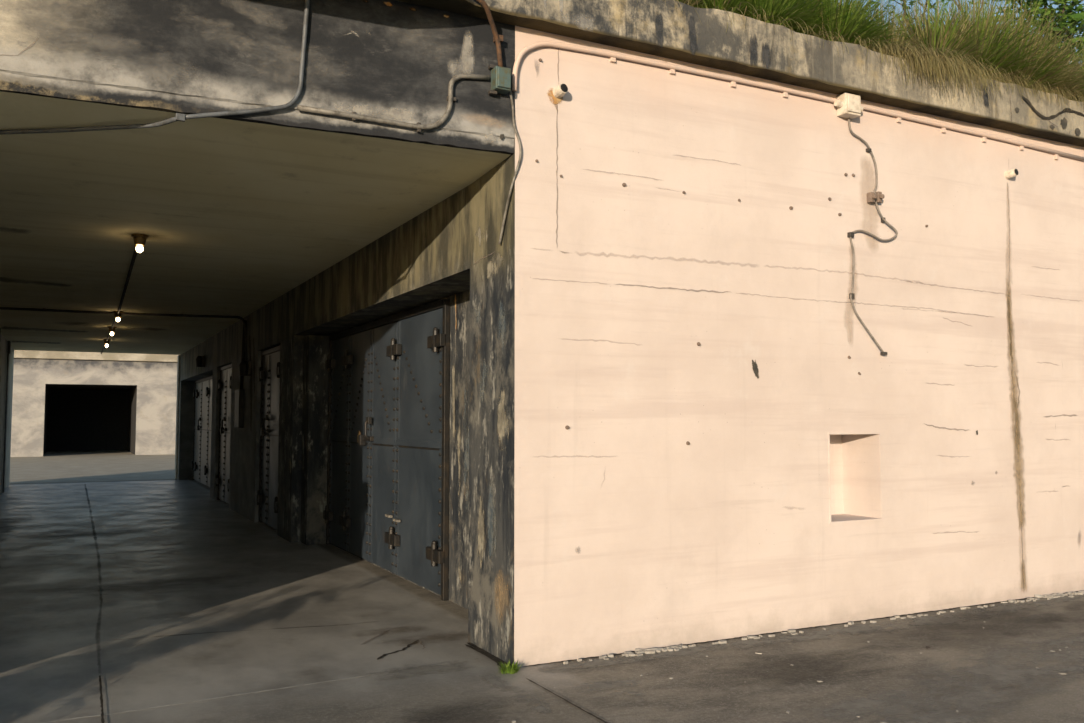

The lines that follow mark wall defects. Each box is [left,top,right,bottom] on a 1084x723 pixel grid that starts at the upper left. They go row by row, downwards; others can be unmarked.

damp [577,16,593,28]
damp [655,13,664,47]
damp [688,15,698,54]
damp [450,35,474,73]
damp [750,36,772,69]
damp [340,104,412,120]
crack [1022,95,1084,120]
rust [1007,284,1024,525]